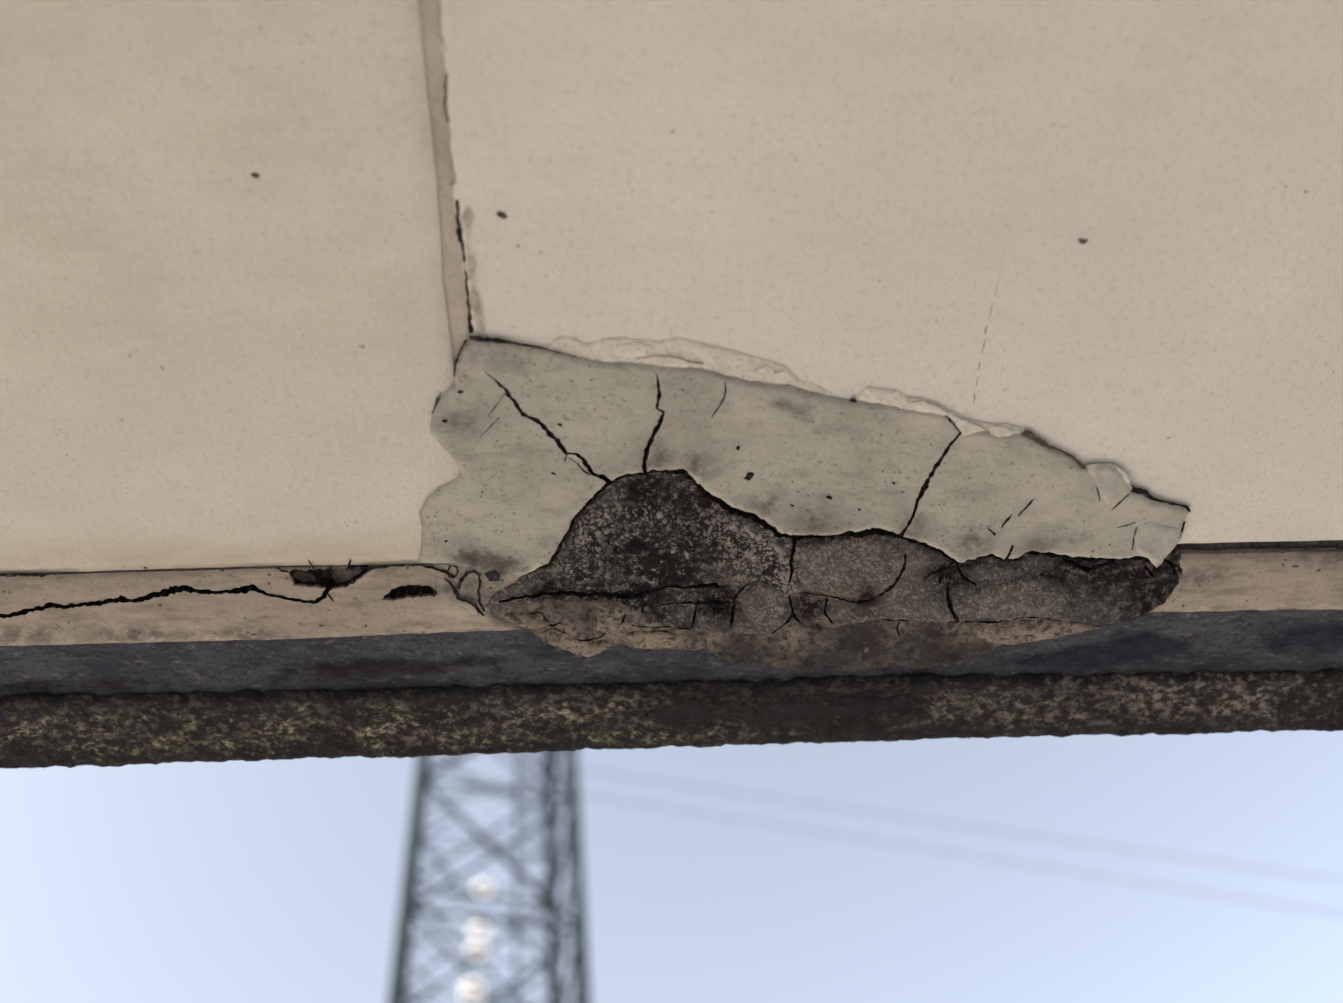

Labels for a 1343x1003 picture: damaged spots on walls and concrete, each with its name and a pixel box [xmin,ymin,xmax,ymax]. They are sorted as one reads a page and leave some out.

crack [0,0,1191,642]
peeling [418,336,1189,673]